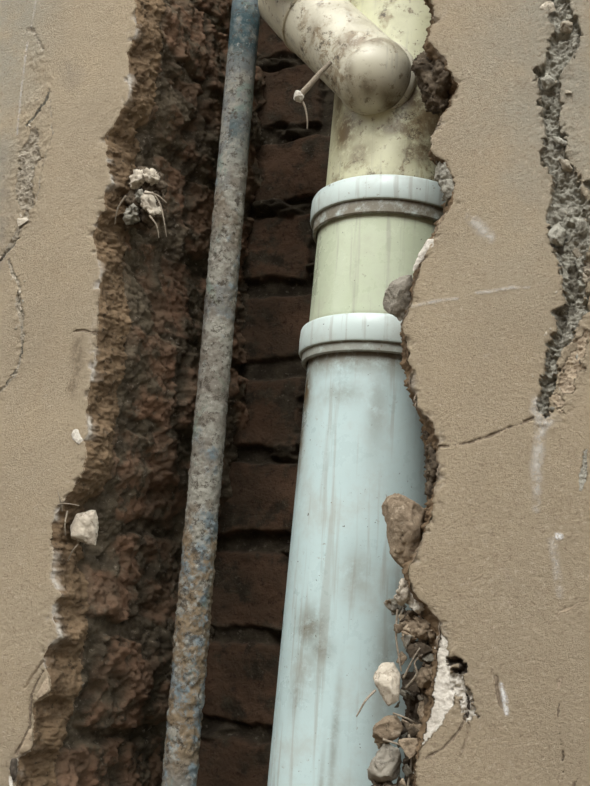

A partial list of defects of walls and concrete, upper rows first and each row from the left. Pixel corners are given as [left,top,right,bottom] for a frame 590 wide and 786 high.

crack [0,88,54,392]
spalling [9,0,166,786]
spalling [394,0,480,786]
crack [440,0,590,448]
crack [557,678,577,786]